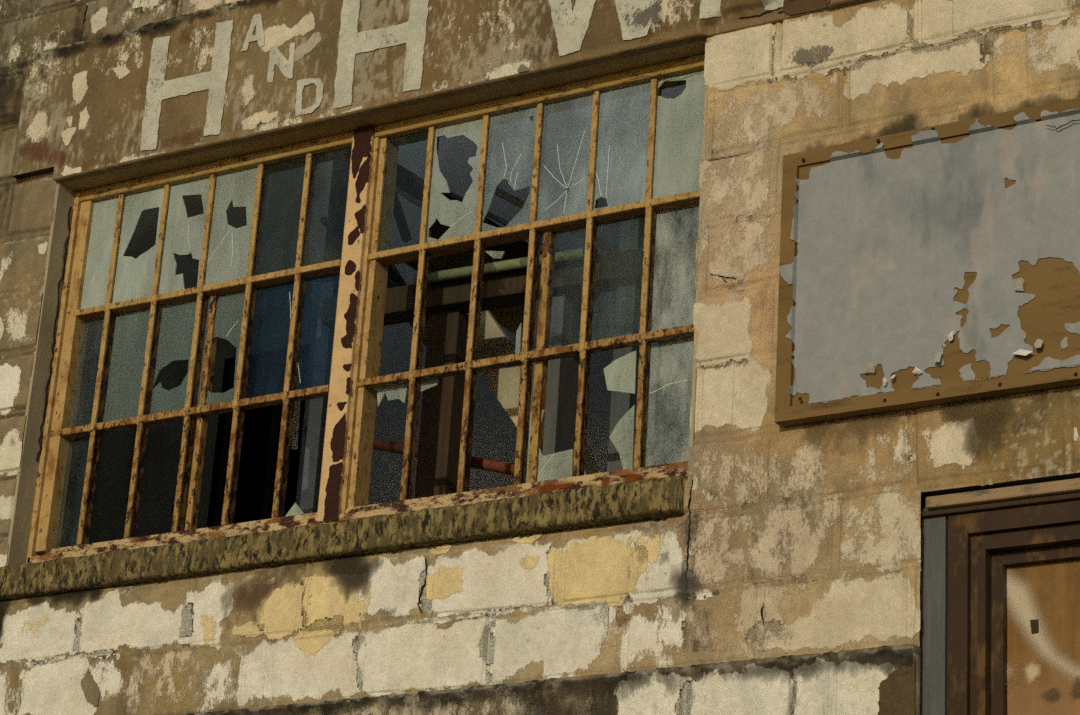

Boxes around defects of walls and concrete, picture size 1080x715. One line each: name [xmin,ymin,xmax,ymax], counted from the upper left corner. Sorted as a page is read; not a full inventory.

peeling [9,0,168,146]
peeling [237,74,302,132]
peeling [260,12,322,62]
peeling [395,0,532,97]
spalling [622,0,695,33]
peeling [61,165,82,176]
corrosion [348,125,373,245]
corrosion [341,260,360,349]
peeling [0,363,21,417]
corrosion [323,363,351,521]
corrosion [539,482,573,492]
peeling [0,419,976,715]